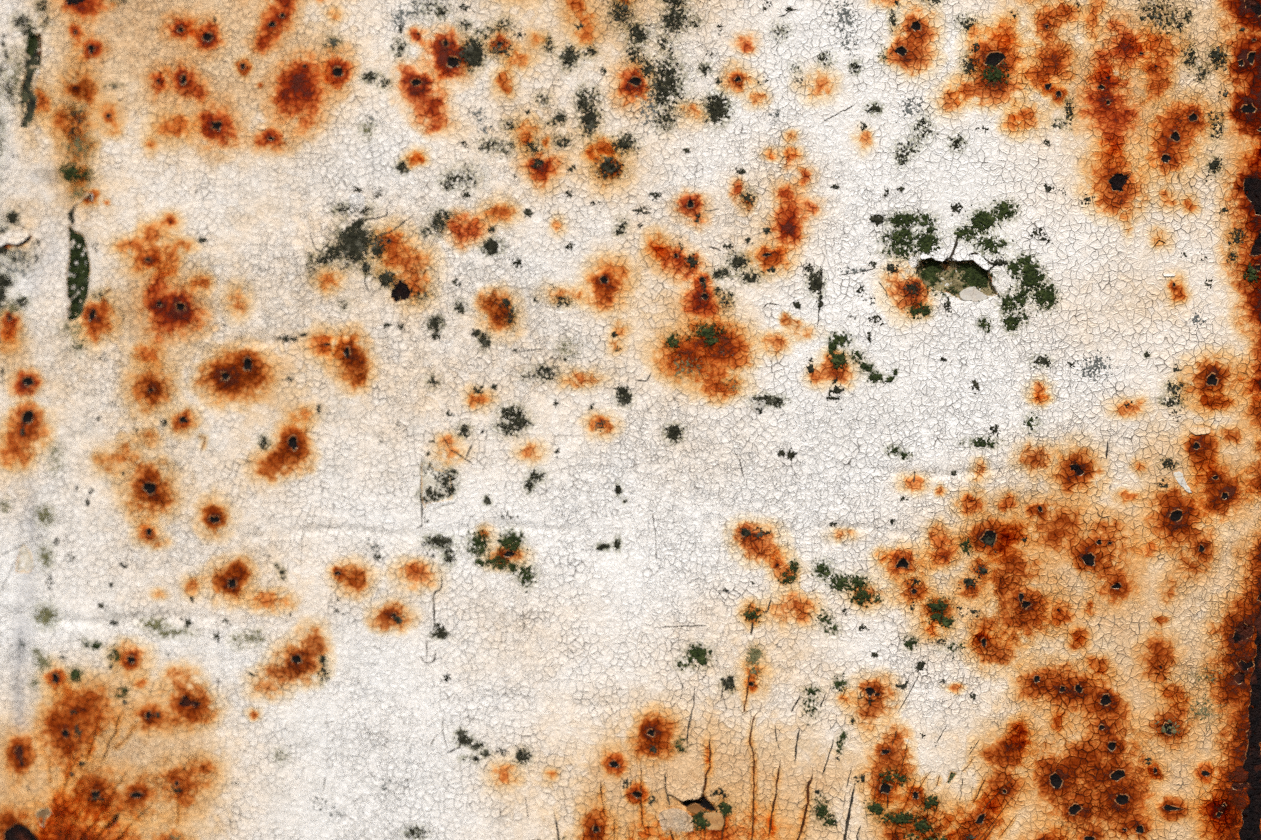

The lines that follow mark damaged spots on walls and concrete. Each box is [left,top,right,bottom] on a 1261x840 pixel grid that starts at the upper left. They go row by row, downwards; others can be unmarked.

rust [1084,1,1174,214]
peeling [65,226,91,321]
peeling [908,246,997,302]
crack [928,231,1000,298]
rust [197,349,270,400]
crack [417,440,473,529]
crack [419,577,442,663]
rust [961,495,1189,840]
rust [1197,538,1261,840]
peeling [659,757,724,838]
crack [525,672,1015,840]
rust [869,723,1028,840]